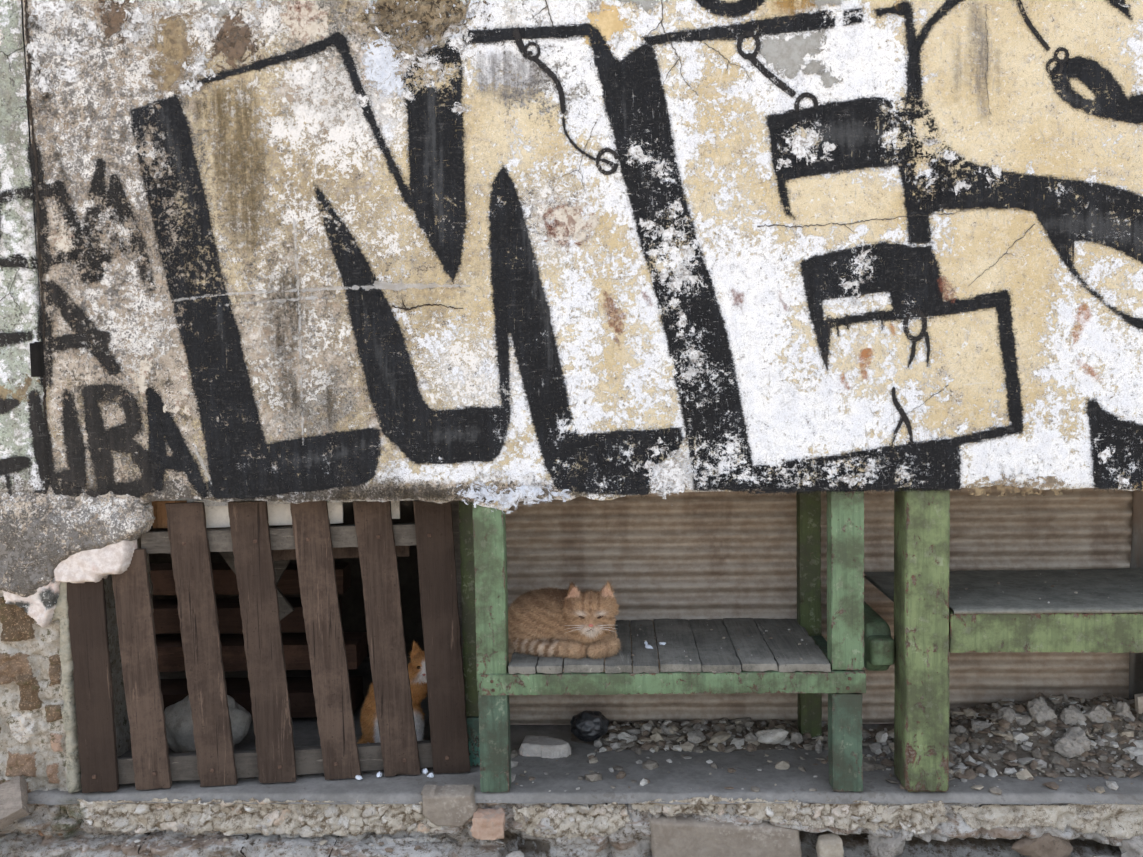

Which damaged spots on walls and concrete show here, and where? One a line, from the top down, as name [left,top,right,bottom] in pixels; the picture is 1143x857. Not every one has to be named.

flaking render [26,0,269,98]
peeling [278,0,331,50]
flaking render [346,0,494,114]
peeling [580,0,668,54]
peeling [759,27,844,88]
peeling [810,0,841,13]
crack [967,224,1035,288]